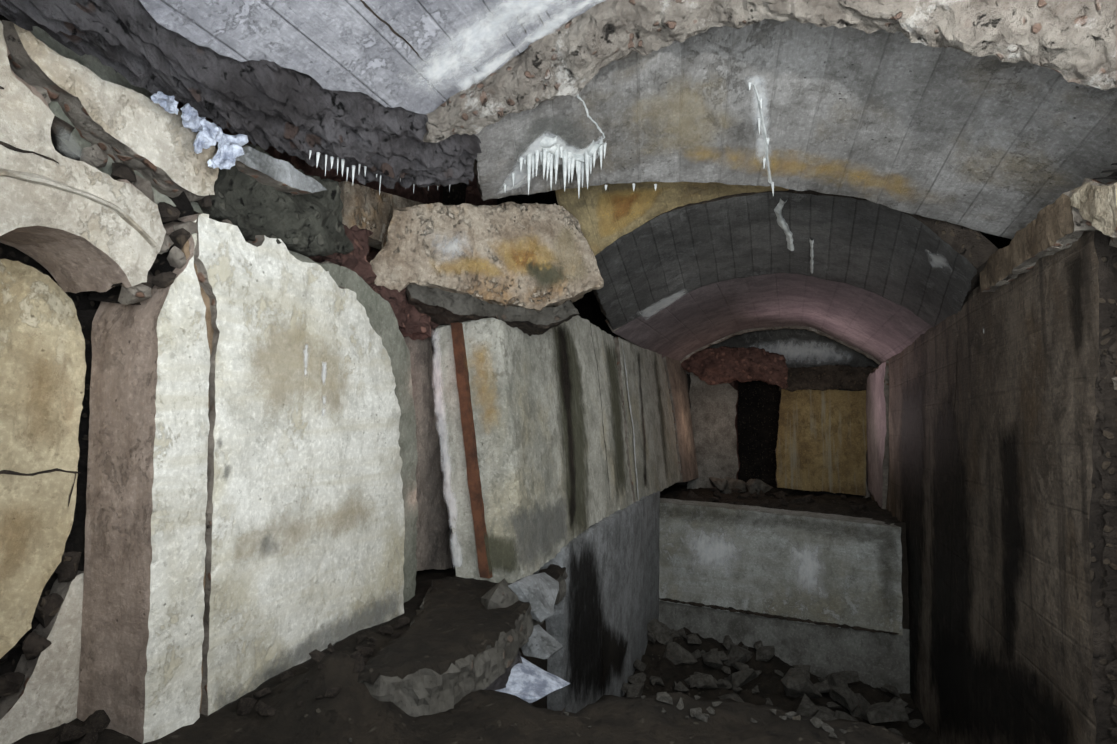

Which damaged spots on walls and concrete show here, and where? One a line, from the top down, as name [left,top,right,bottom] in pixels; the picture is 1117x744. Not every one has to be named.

water stain [309,150,382,195]
water stain [501,121,607,196]
efflorescence [748,78,794,251]
crack [0,79,258,698]
corrosion [451,322,517,578]
water stain [1068,254,1082,351]
water stain [694,534,736,566]
water stain [771,374,1070,744]